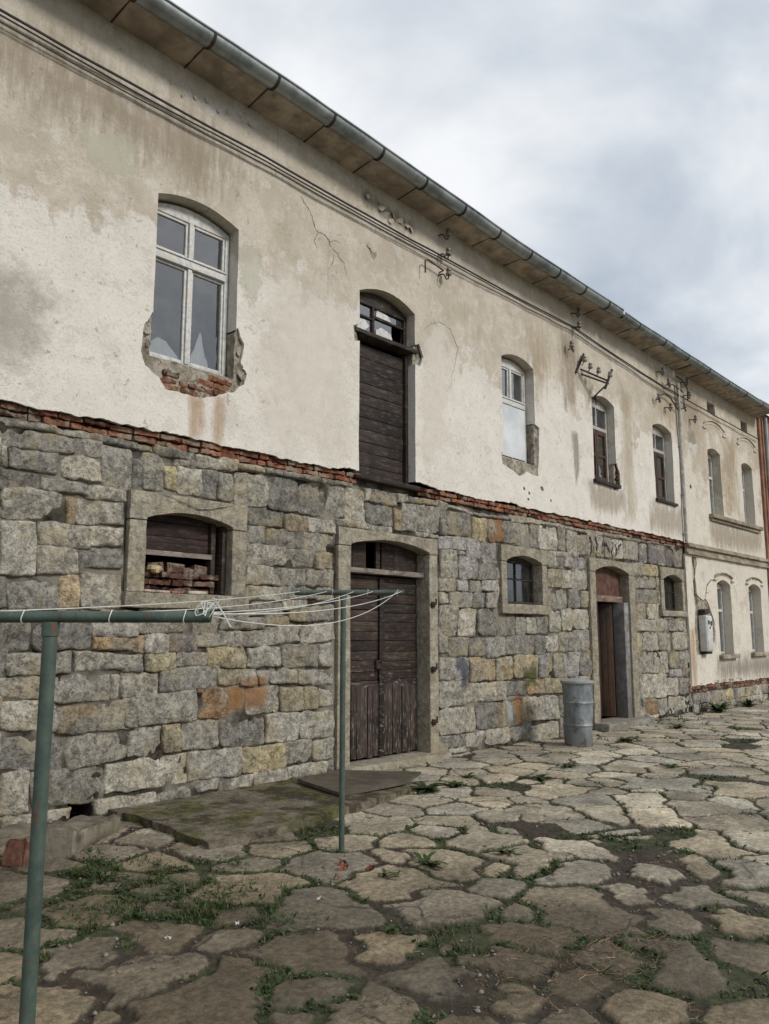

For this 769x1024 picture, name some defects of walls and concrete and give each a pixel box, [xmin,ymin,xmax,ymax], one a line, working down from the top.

crack [301,196,347,276]
flaking render [141,316,245,398]
flaking render [501,425,542,500]